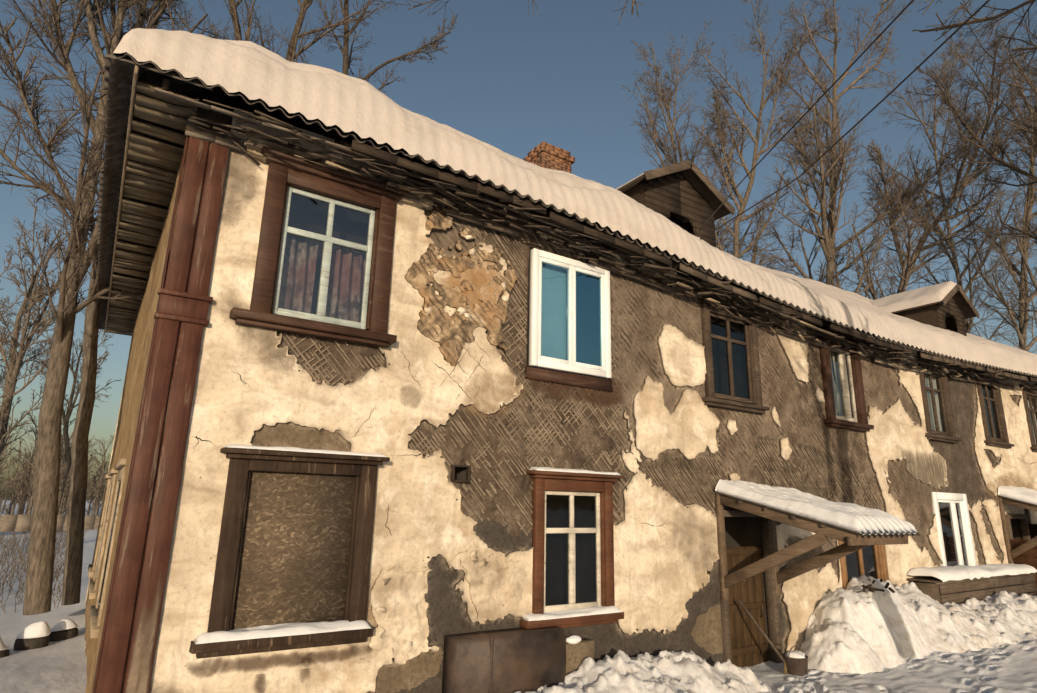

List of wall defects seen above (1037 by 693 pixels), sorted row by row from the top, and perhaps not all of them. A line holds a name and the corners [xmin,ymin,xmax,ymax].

spalling [424,210,494,258]
spalling [607,233,1002,566]
spalling [250,422,350,454]
spalling [473,519,532,555]
spalling [779,537,837,574]
spalling [367,554,521,693]
spalling [564,560,723,666]